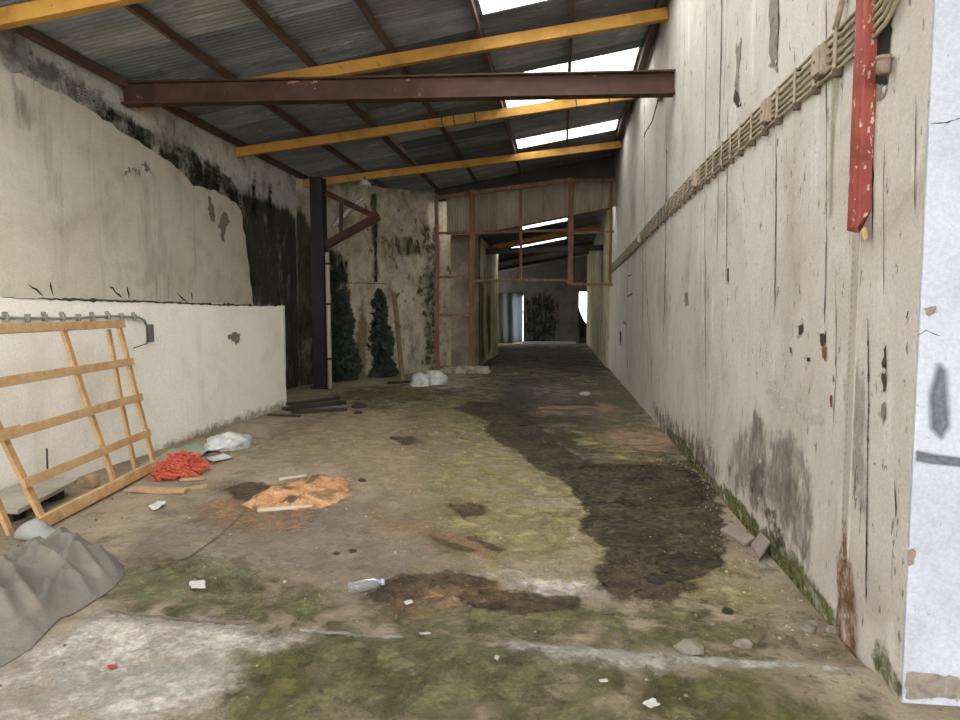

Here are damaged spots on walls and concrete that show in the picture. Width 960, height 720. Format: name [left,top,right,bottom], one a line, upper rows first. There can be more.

spalling [733,38,742,108]
spalling [768,0,780,73]
spalling [867,71,888,109]
spalling [871,2,893,56]
leakage [0,38,313,389]
flaking render [206,191,230,245]
leakage [417,225,441,370]
peeling [227,332,241,345]
leakage [729,413,812,555]
rust [836,525,857,659]